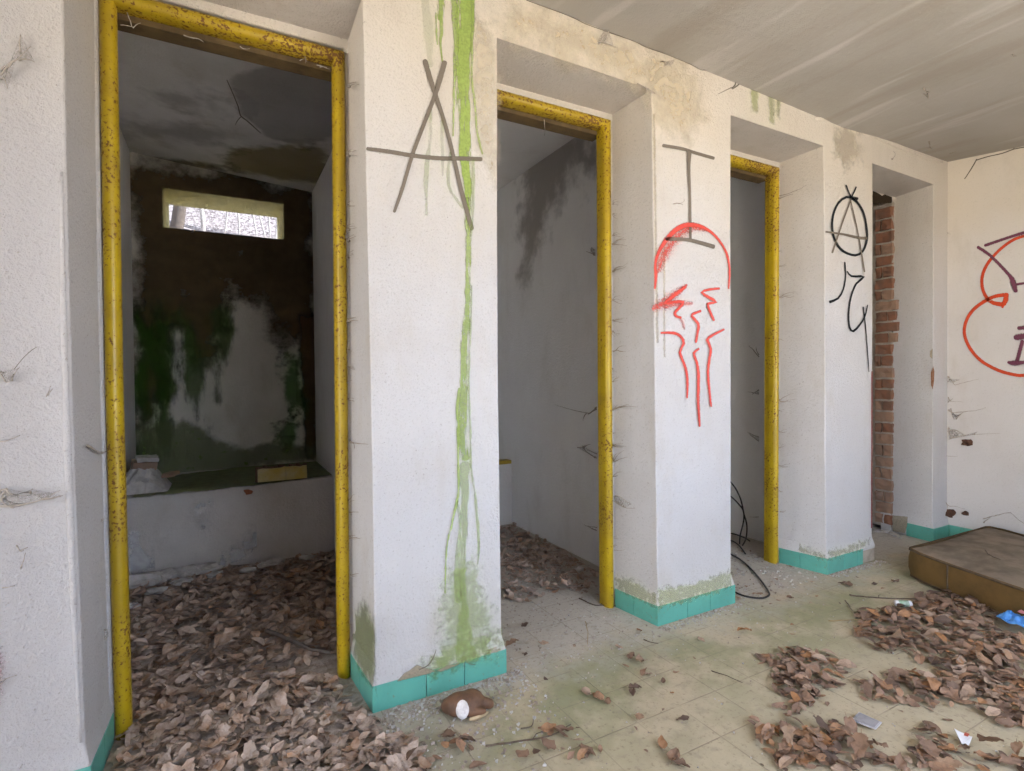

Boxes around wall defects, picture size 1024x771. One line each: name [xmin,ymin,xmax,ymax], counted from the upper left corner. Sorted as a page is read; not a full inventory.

crack [227,81,261,133]
damp [130,147,325,460]
damp [435,0,483,593]
flaking render [872,191,908,533]